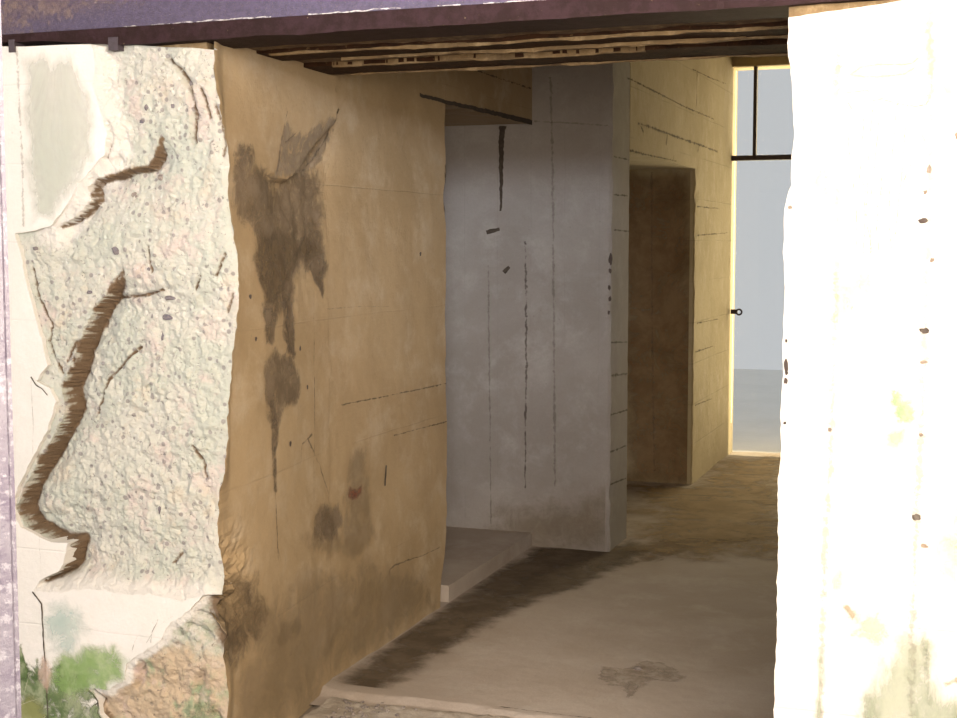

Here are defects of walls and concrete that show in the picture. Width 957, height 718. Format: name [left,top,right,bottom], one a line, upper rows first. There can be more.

spalling [16,44,239,718]
damp [235,146,328,491]
damp [19,646,41,679]